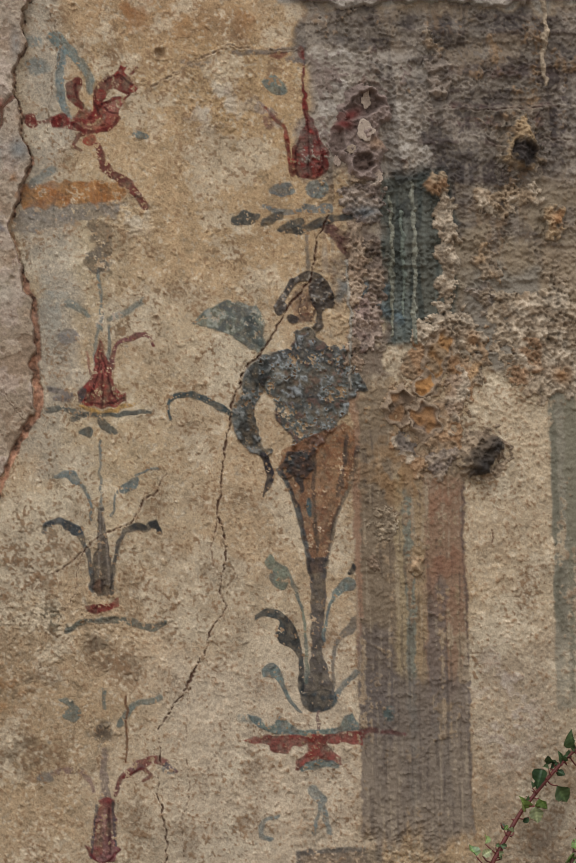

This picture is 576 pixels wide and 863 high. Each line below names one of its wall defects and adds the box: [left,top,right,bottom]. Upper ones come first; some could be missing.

flaking render [299,0,532,11]
flaking render [325,83,392,182]
crack [0,0,66,498]
flaking render [381,325,455,443]
crack [49,471,171,613]
crack [153,205,333,863]